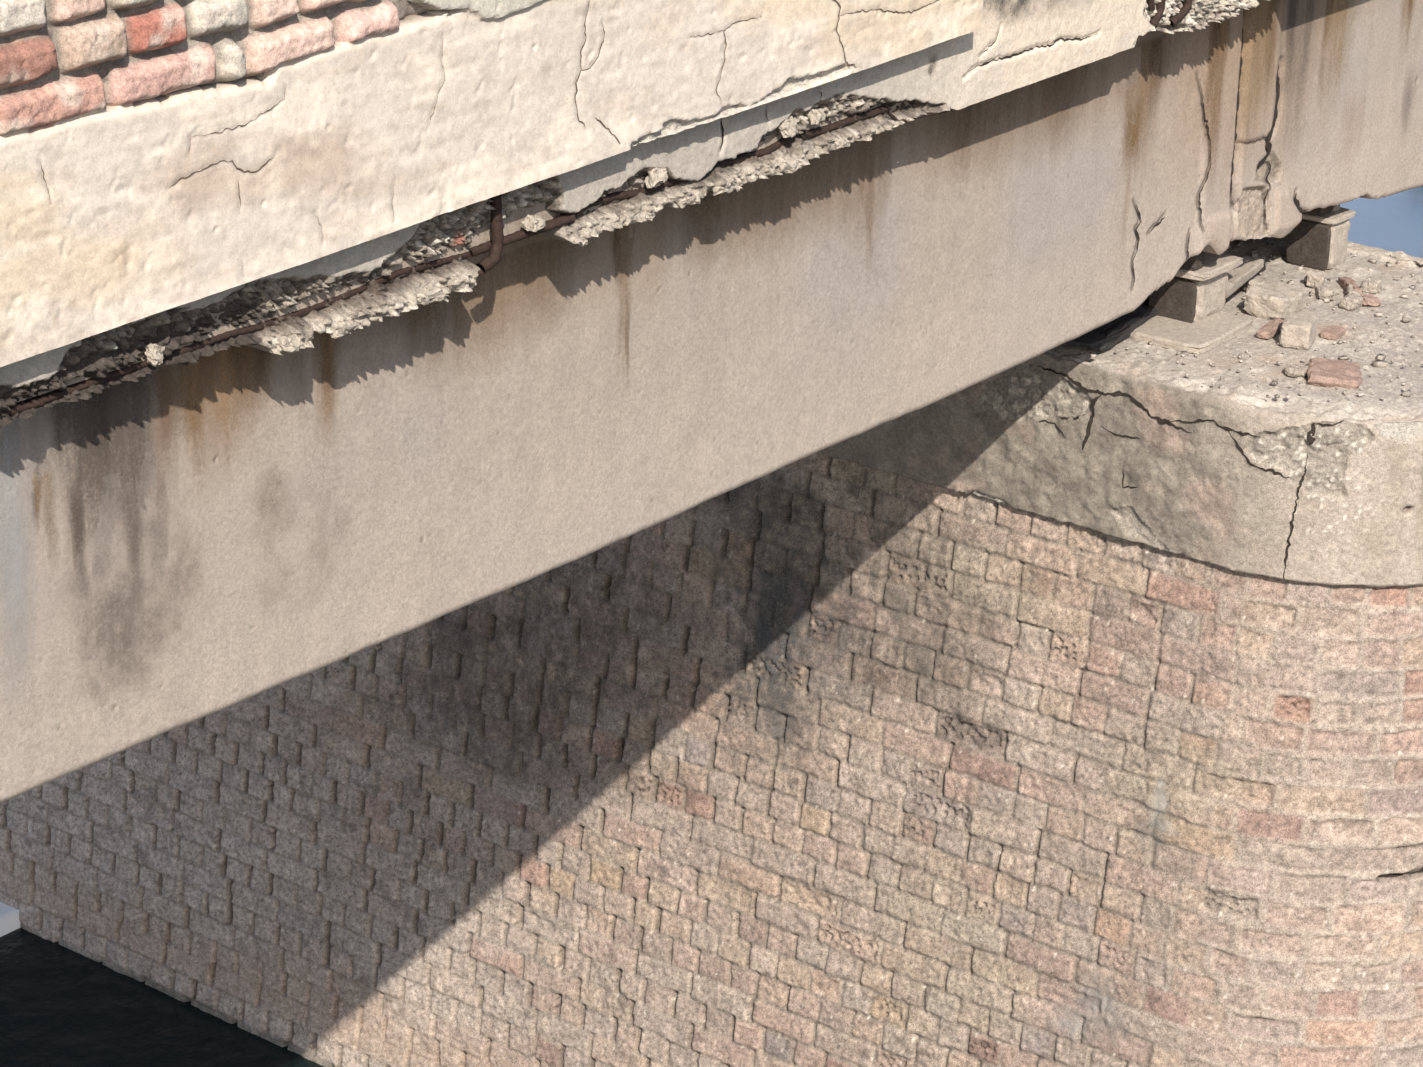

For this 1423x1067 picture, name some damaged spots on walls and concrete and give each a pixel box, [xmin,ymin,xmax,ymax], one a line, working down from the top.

crack [575,1,620,143]
crack [834,0,938,66]
crack [965,25,1098,76]
crack [169,88,286,206]
crack [1132,9,1306,286]
spalling [0,65,951,428]
corrosion [163,345,272,430]
corrosion [315,333,338,404]
water stain [57,373,165,553]
crack [1029,364,1343,580]
spalling [1244,421,1423,499]
crack [1379,868,1423,878]